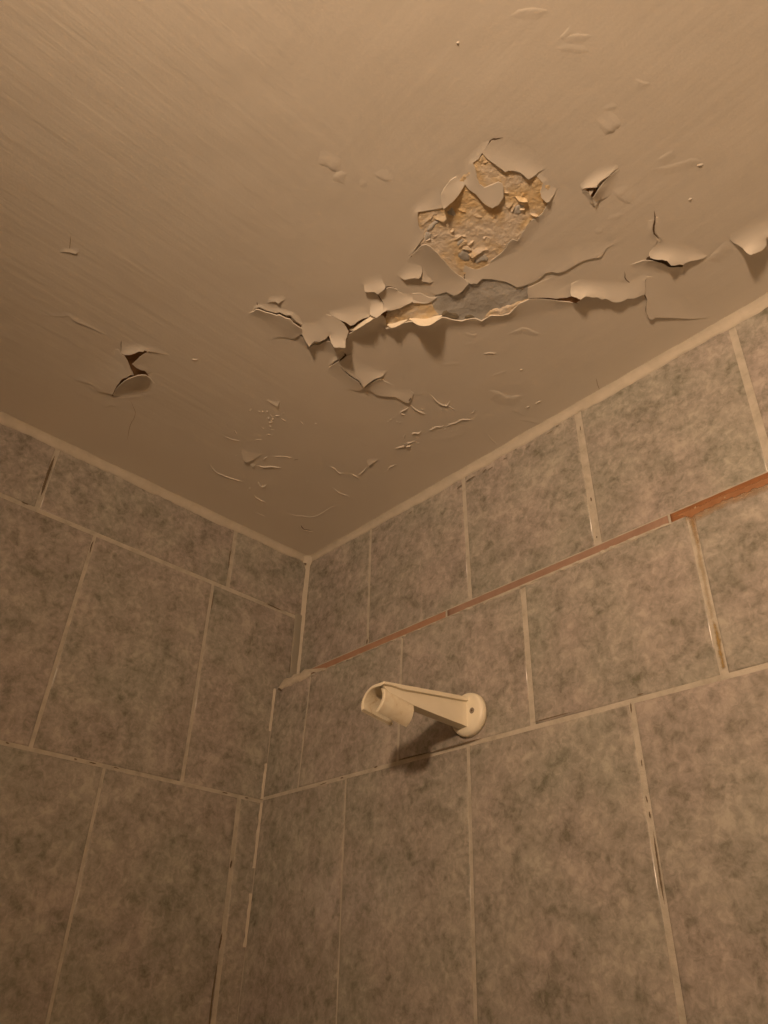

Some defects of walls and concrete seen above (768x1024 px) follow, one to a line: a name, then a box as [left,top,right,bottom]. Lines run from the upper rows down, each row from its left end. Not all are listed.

peeling [294,136,768,357]
peeling [73,342,169,401]